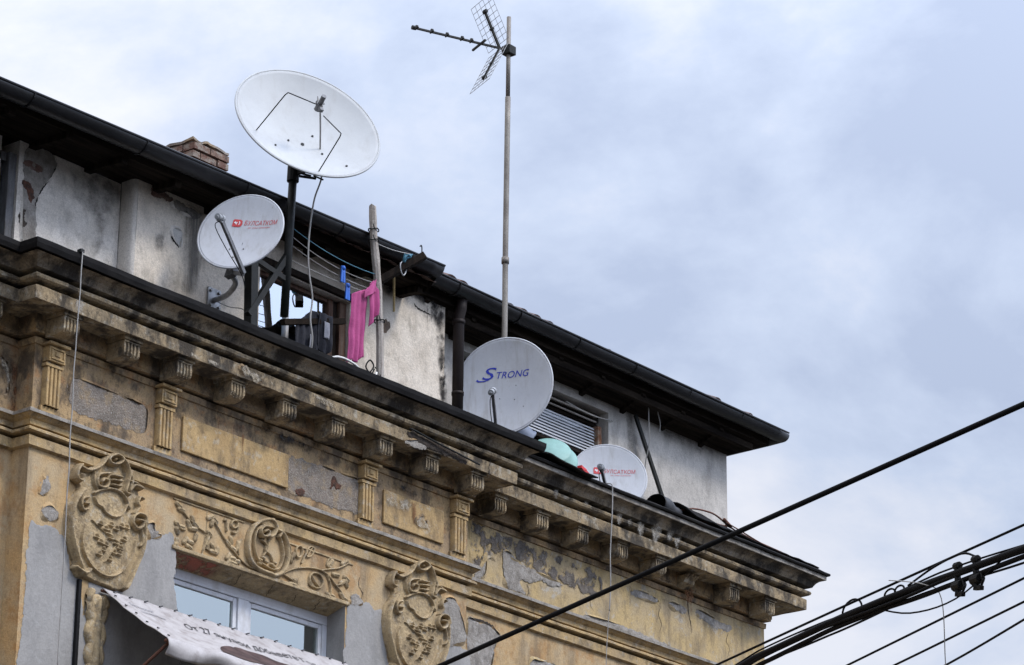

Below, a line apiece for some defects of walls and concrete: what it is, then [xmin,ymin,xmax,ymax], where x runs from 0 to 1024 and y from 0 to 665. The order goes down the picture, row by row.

flaking render [18,145,58,241]
flaking render [67,377,149,434]
peeling [38,475,59,522]
flaking render [288,455,359,515]
peeling [147,520,162,540]
peeling [469,518,603,597]